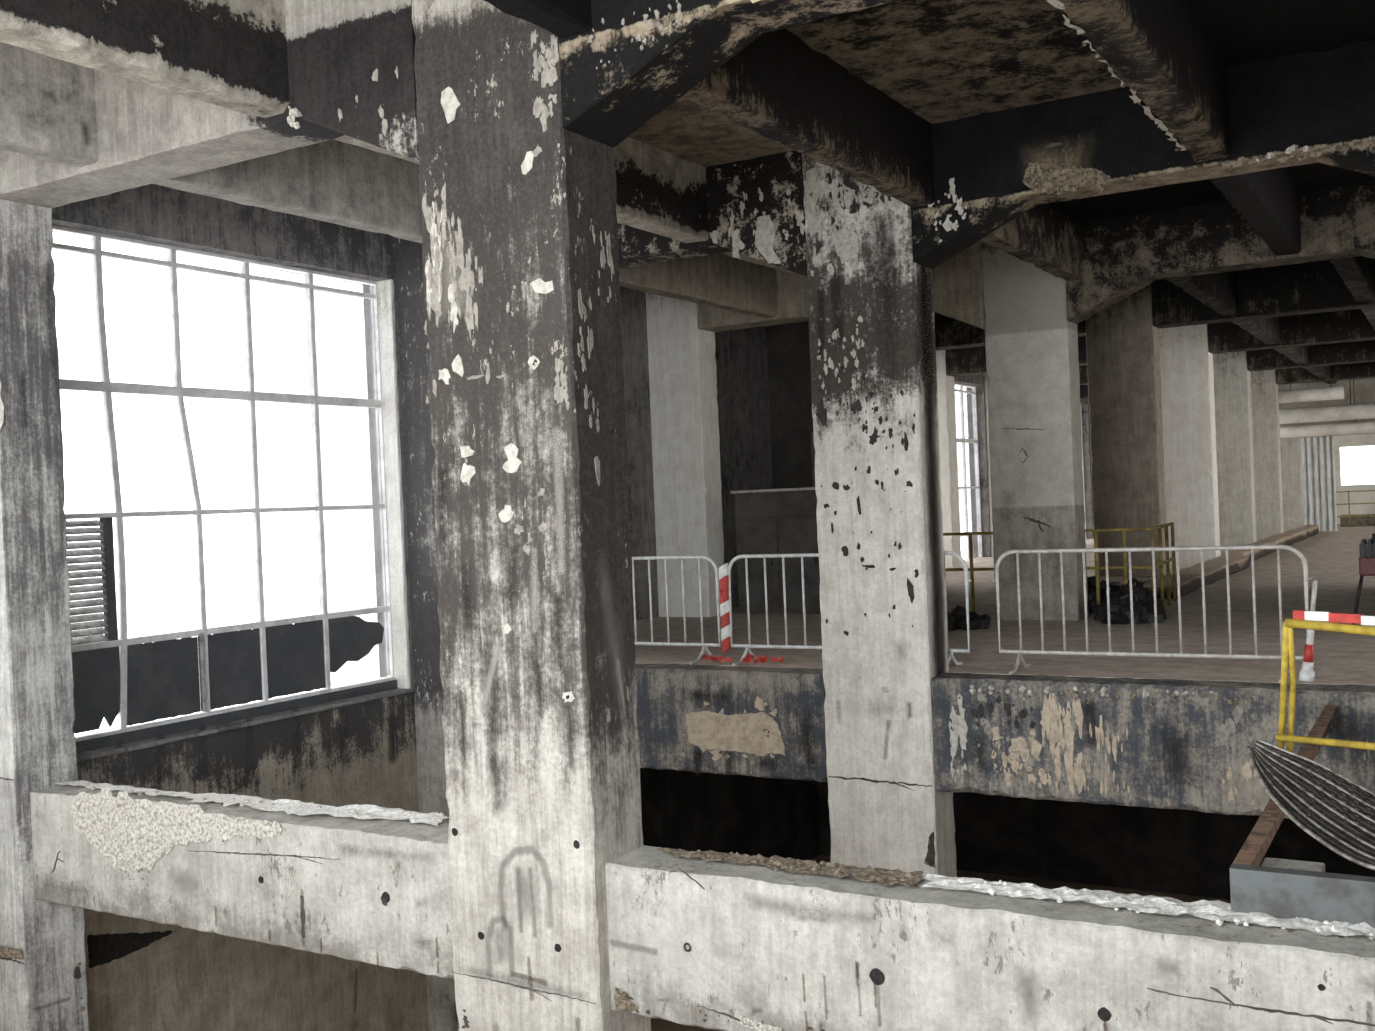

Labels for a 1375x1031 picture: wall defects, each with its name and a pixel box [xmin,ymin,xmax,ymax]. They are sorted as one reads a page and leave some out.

peeling [441,86,461,123]
peeling [521,35,560,175]
peeling [421,182,483,348]
peeling [709,166,905,277]
peeling [426,354,506,404]
peeling [528,226,614,428]
peeling [815,316,916,451]
peeling [502,443,522,473]
damp [554,430,564,573]
damp [484,623,512,704]
damp [562,691,575,703]
damp [1083,702,1096,744]